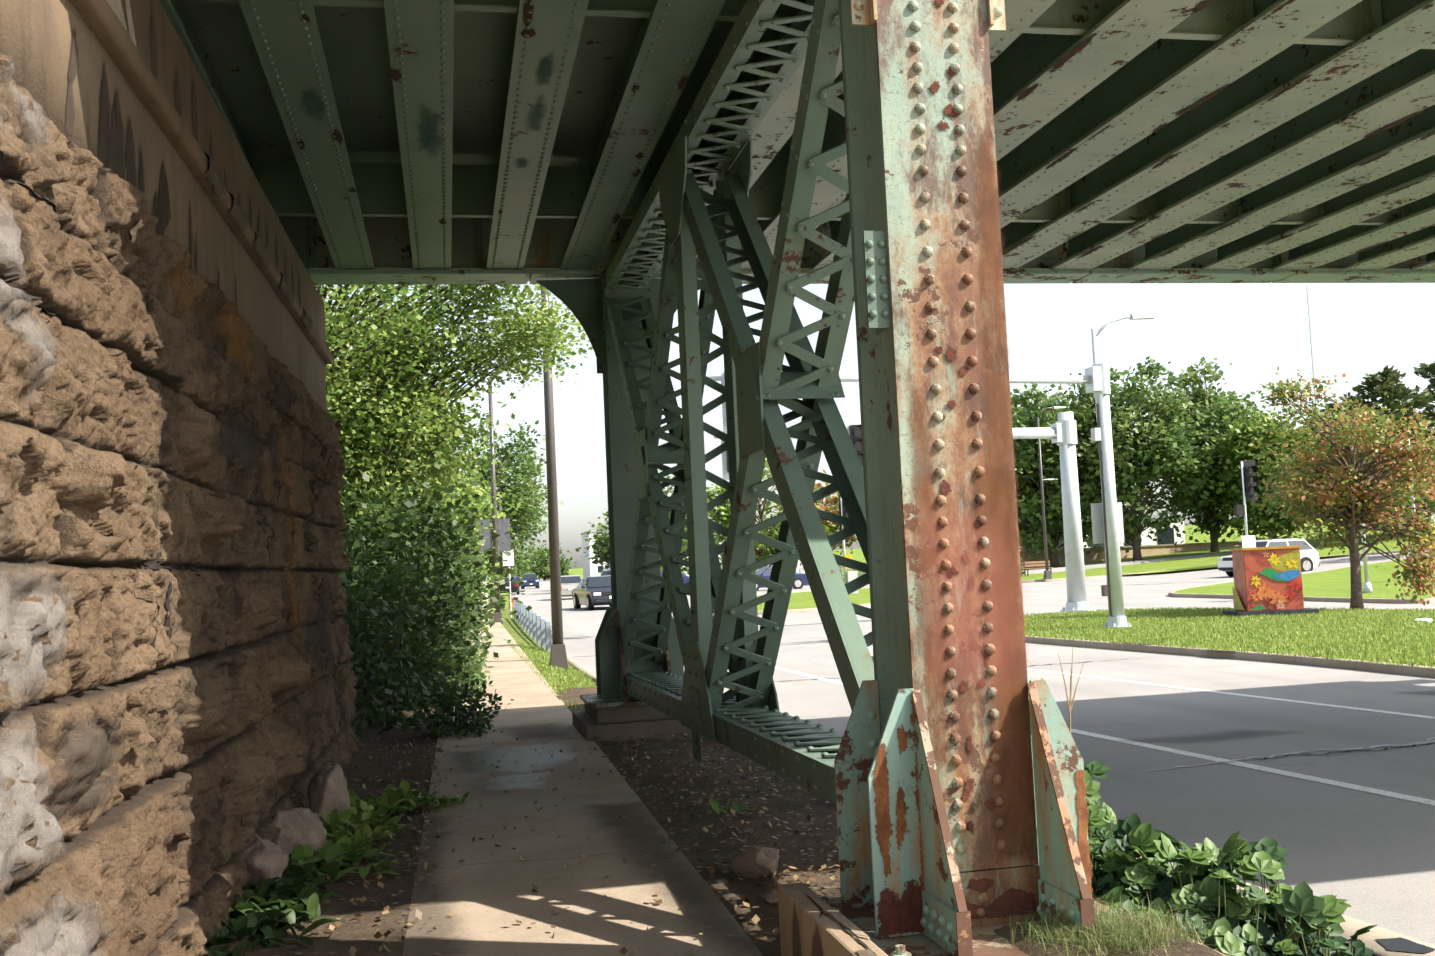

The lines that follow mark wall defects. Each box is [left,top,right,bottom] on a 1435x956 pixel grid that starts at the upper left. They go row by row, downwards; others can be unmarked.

rust [521,0,536,38]
rust [930,66,959,130]
rust [1260,74,1313,105]
rust [934,345,968,376]
rust [940,480,952,497]
rust [943,550,975,591]
rust [960,641,991,693]
rust [962,776,995,812]